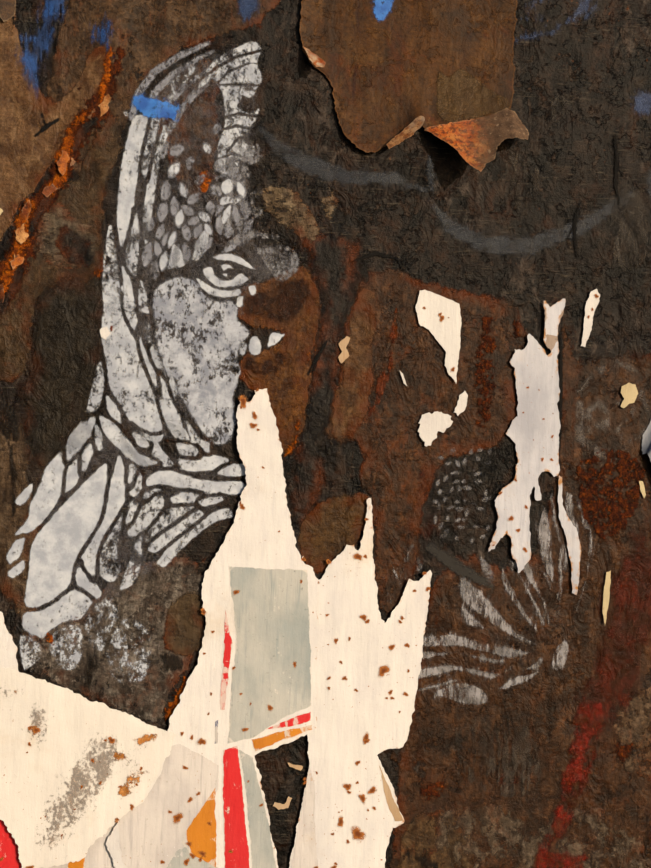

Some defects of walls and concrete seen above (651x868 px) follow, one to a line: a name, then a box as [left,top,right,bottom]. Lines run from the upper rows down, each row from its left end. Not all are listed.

peeling [303,47,326,67]
peeling [386,108,529,172]